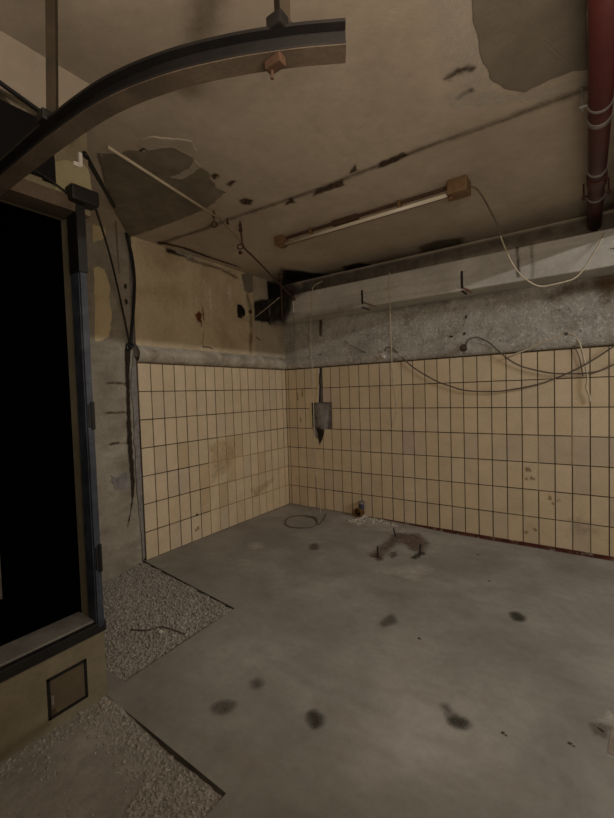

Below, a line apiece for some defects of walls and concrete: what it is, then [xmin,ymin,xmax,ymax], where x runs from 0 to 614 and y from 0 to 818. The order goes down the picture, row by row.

spalling [472,0,587,95]
peeling [55,159,92,193]
peeling [97,136,225,238]